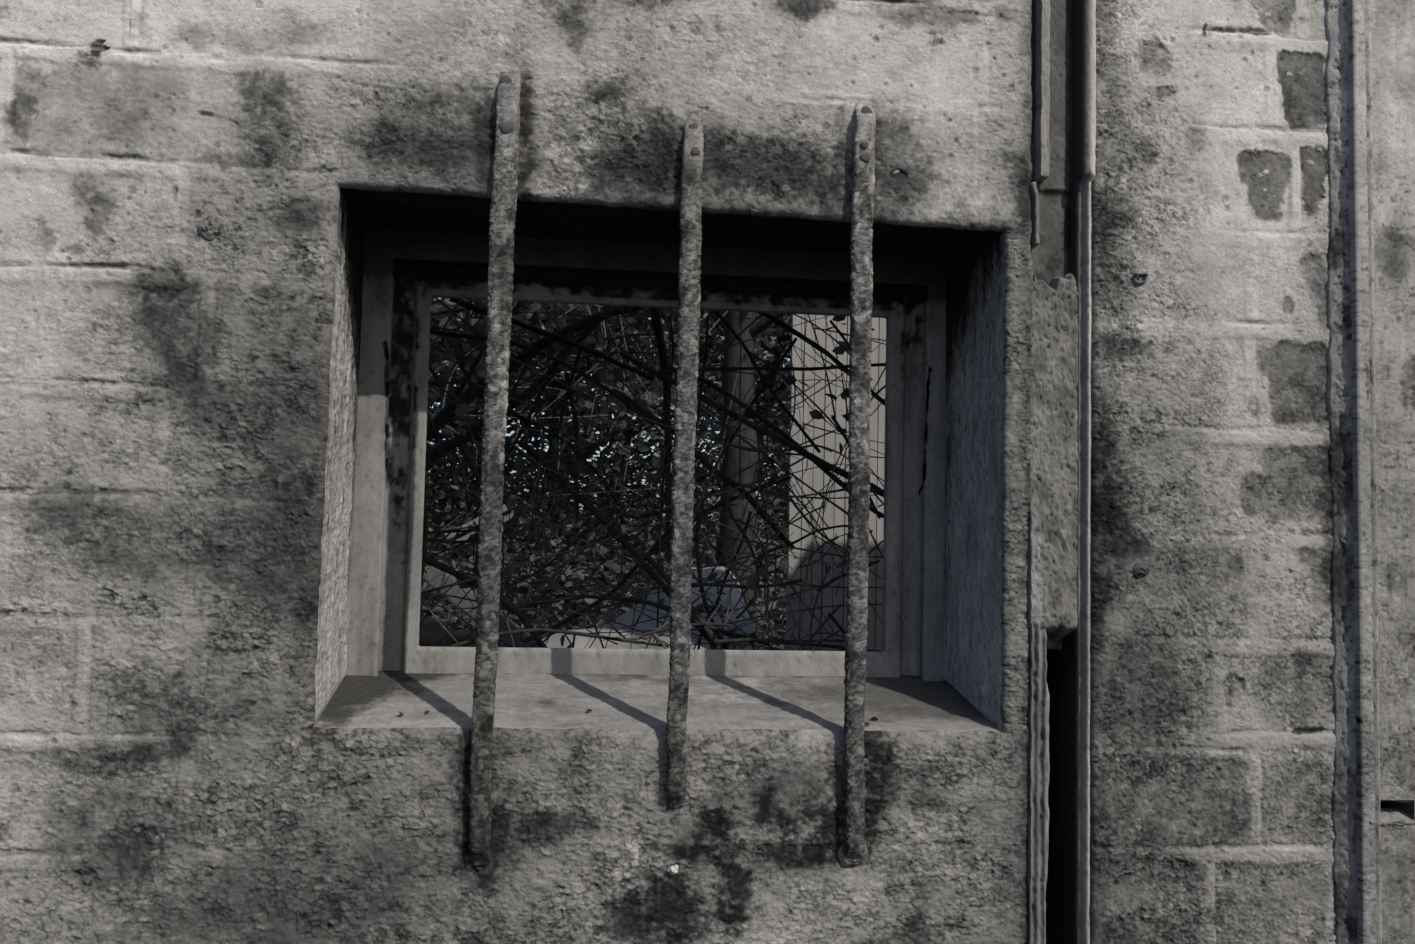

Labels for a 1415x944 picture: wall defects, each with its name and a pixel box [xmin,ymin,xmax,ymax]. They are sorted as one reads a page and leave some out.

leakage [6,92,37,133]
leakage [139,267,322,450]
leakage [209,72,295,169]
leakage [274,189,491,442]
leakage [387,258,489,525]
leakage [512,264,679,300]
leakage [514,74,682,245]
leakage [700,274,851,309]
leakage [701,127,851,254]
leakage [872,113,1002,384]
leakage [209,469,324,622]
leakage [1091,375,1191,724]